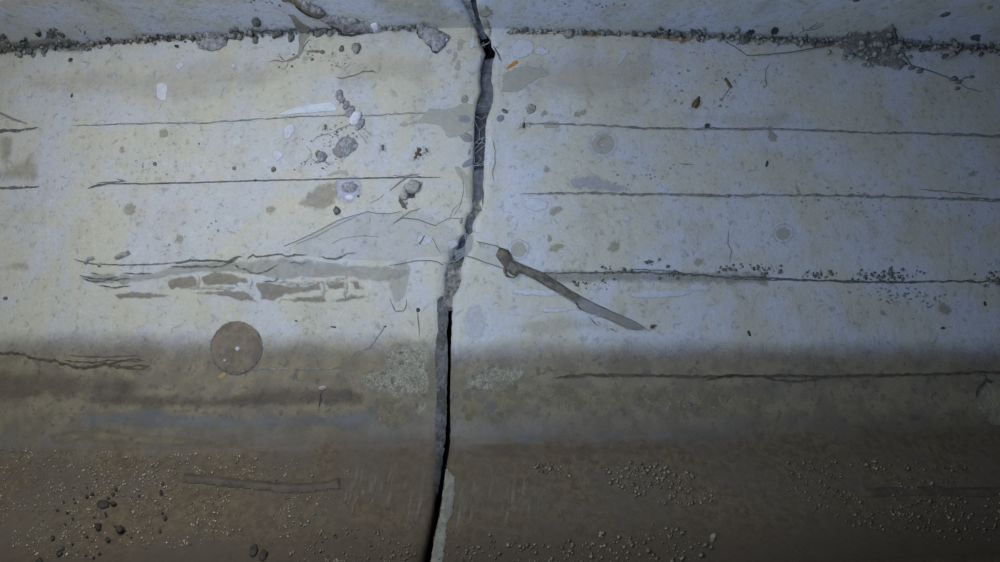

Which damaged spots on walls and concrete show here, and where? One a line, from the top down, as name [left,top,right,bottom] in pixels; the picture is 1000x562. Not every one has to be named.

crack [525,123,1000,138]
crack [482,141,496,205]
crack [522,189,1000,202]
crack [74,258,168,266]
crack [543,231,1000,290]
spalling [168,273,360,302]
crack [0,351,149,370]
leakage [0,342,437,437]
leakage [450,351,1000,427]
crack [552,370,1000,383]